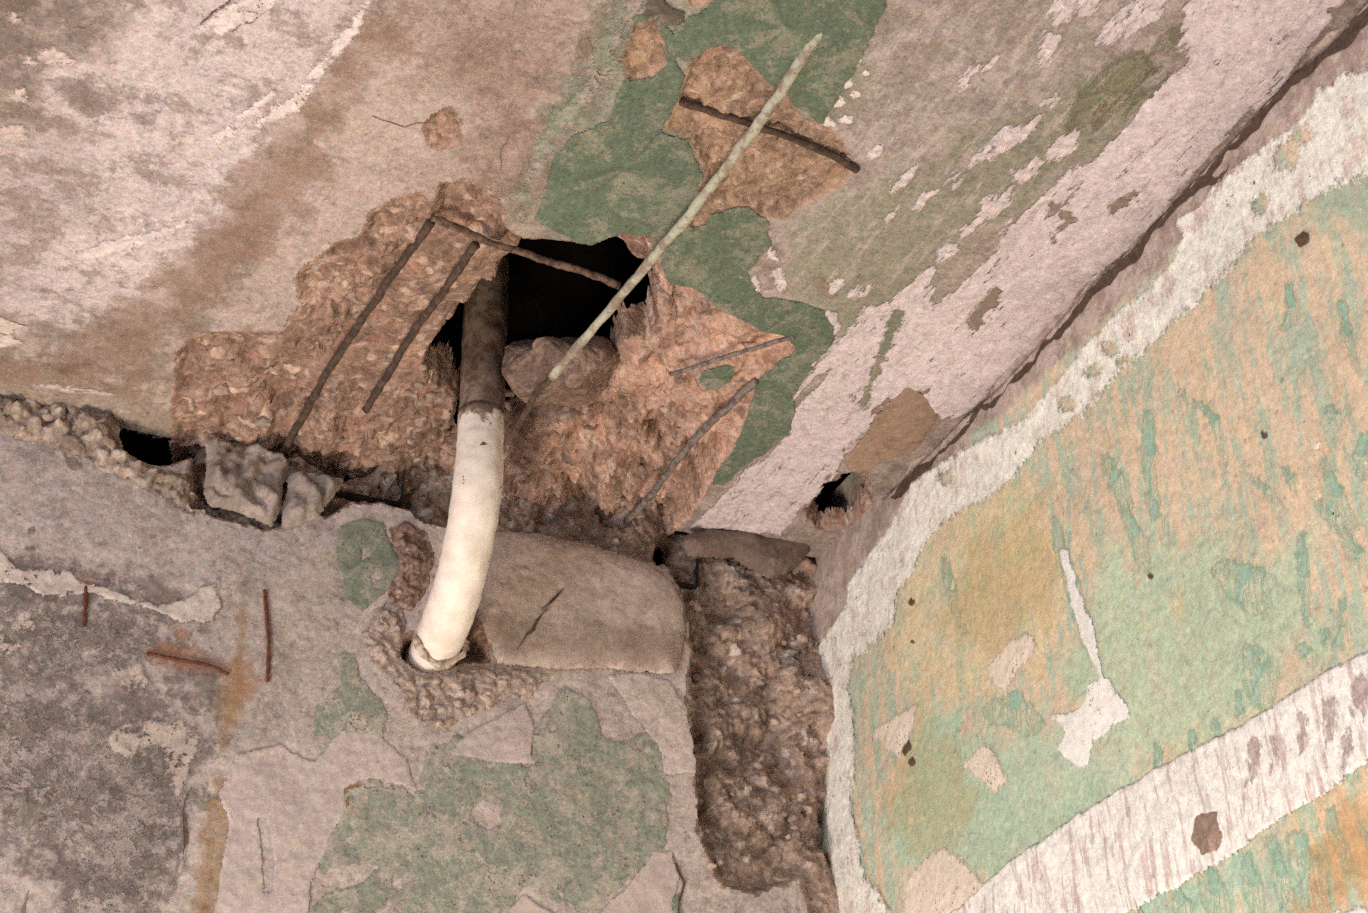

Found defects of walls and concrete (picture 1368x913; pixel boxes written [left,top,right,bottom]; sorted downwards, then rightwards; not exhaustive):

spalling [0,0,887,731]
peeling [496,0,1368,913]
flaking render [0,695,201,913]
rust [147,652,229,676]
rust [263,589,271,682]
peeling [314,653,387,749]
peeling [312,686,671,913]